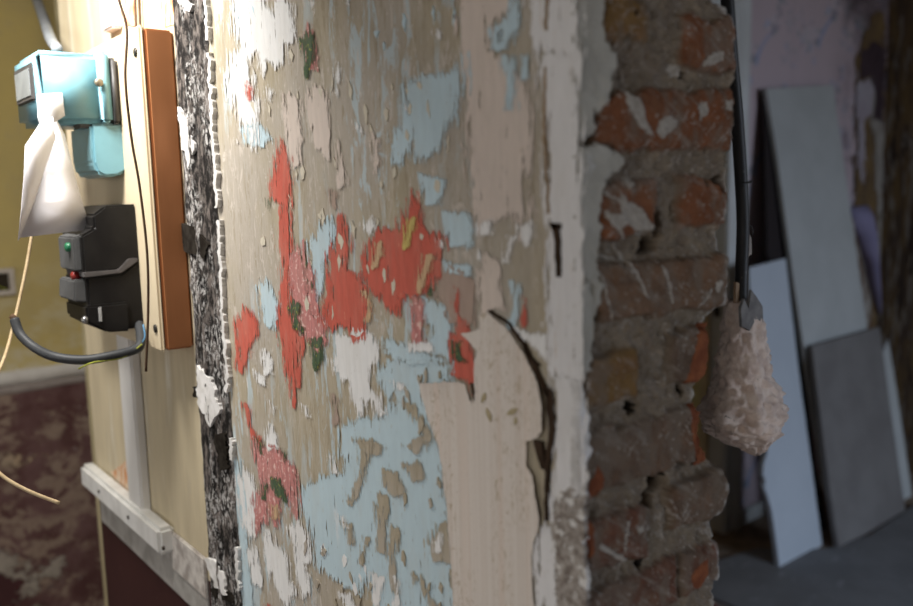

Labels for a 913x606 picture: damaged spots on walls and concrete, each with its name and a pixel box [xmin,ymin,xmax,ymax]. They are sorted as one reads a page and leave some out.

peeling [223,0,297,153]
peeling [177,107,197,169]
peeling [851,9,887,330]
peeling [195,365,223,427]
peeling [241,400,279,452]
peeling [326,327,390,417]
crack [468,383,476,401]
crack [488,310,557,521]
peeling [514,325,548,364]
flaking render [550,0,736,606]
peeling [205,557,228,595]
peeling [235,465,312,606]